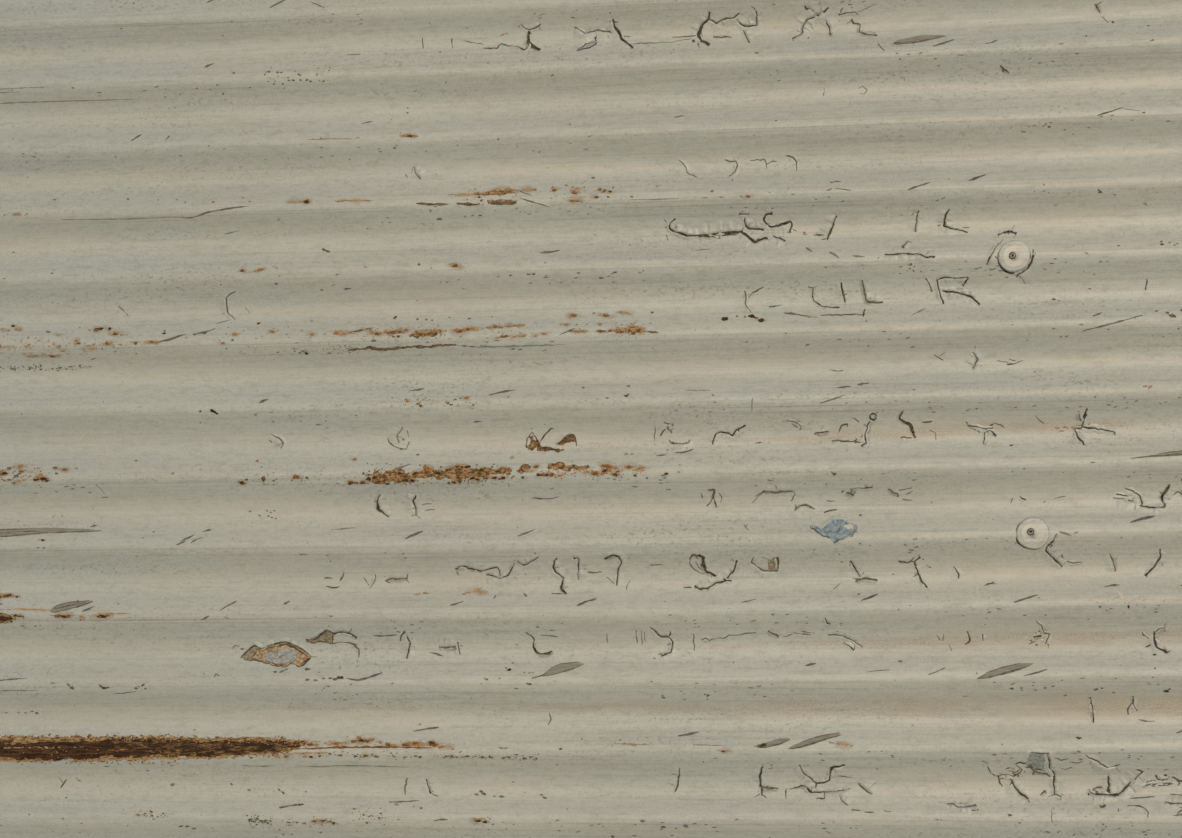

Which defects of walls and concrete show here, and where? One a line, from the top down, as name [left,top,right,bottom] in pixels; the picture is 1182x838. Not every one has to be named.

crack [573,6,763,53]
rust [416,183,614,208]
crack [664,181,852,250]
crack [795,207,1041,318]
rust [219,320,566,355]
crack [786,411,936,447]
rust [347,453,648,489]
peeling [809,515,857,544]
rust [0,593,131,625]
peeling [240,625,343,681]
rust [0,734,537,766]
crack [982,751,1182,821]